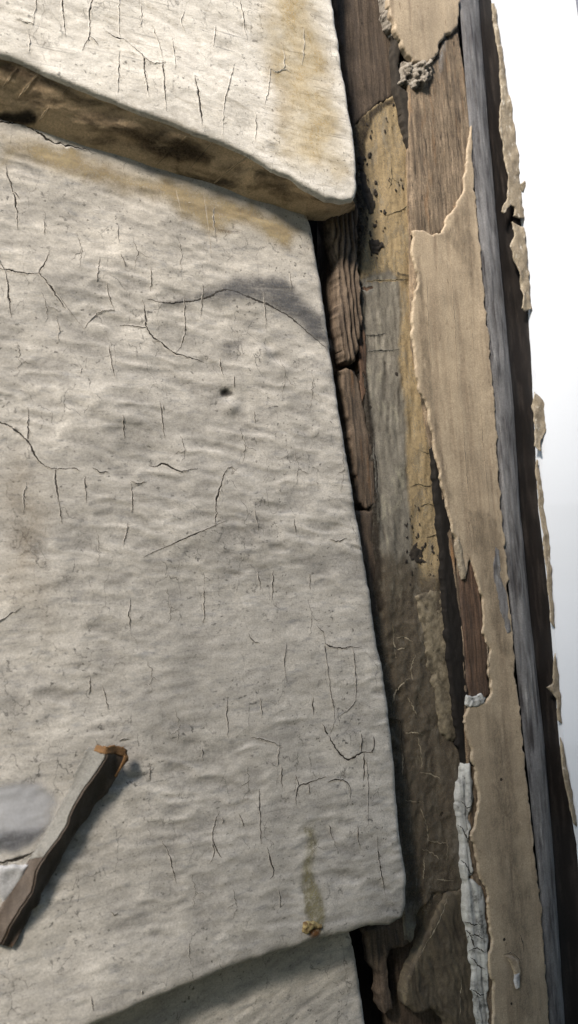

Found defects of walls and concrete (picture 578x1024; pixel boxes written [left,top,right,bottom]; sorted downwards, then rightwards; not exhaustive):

crack [17,0,235,128]
crack [255,28,305,140]
peeling [407,32,470,236]
crack [0,164,235,388]
crack [366,333,399,353]
crack [0,401,198,567]
crack [214,410,256,526]
crack [0,607,21,621]
peeling [454,536,490,707]
crack [88,675,109,709]
crack [0,851,34,865]
crack [161,572,524,1020]